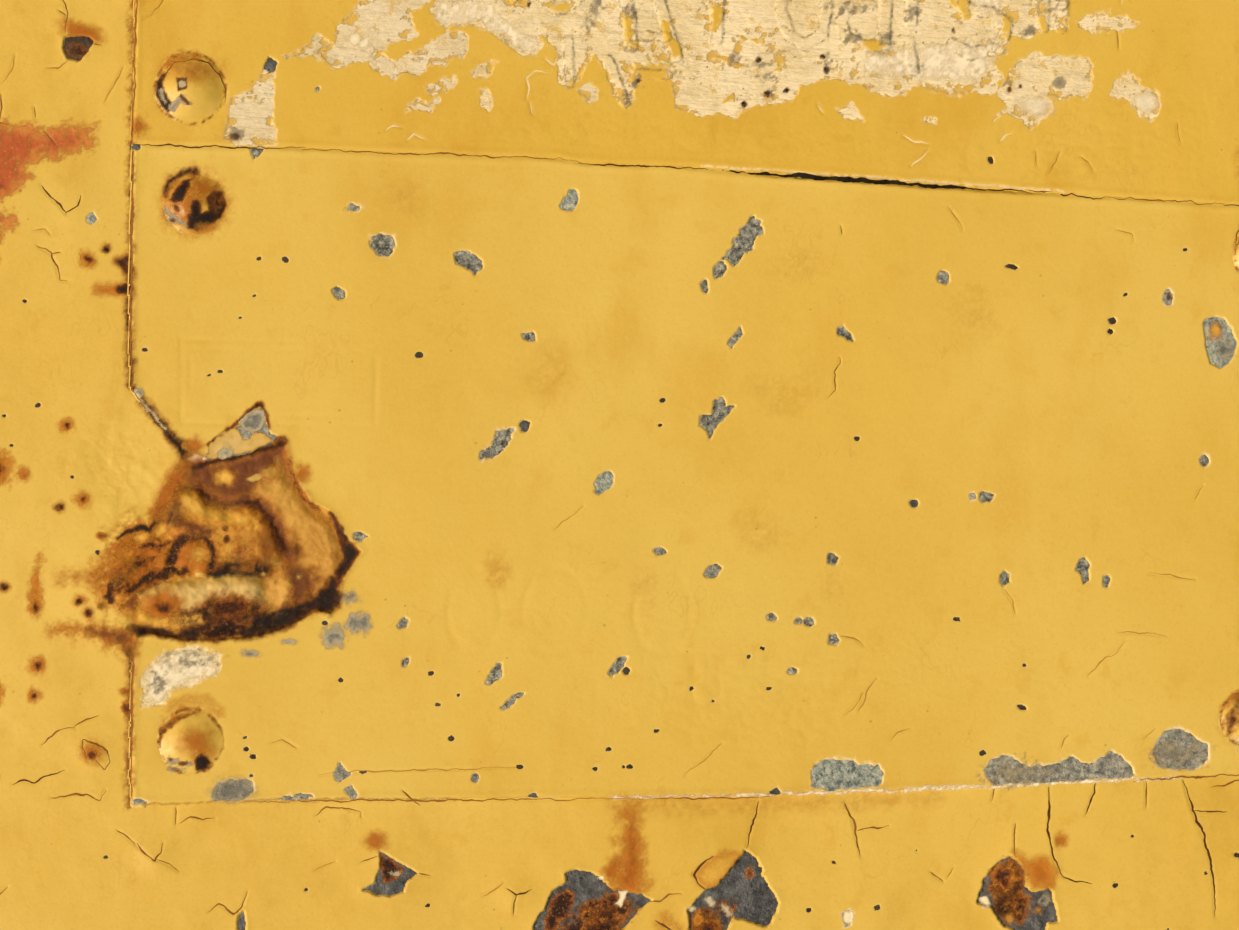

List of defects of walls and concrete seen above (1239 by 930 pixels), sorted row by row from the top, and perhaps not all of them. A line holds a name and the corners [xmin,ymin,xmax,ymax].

peeling [224,0,1136,159]
rust [0,450,30,484]
rust [51,213,320,799]
rust [27,554,43,614]
rust [30,657,45,672]
peeling [811,758,884,792]
peeling [979,750,1135,790]
peeling [1151,729,1208,770]
peeling [364,852,418,896]
rust [604,802,645,895]
peeling [688,851,778,930]
crack [1134,774,1239,915]